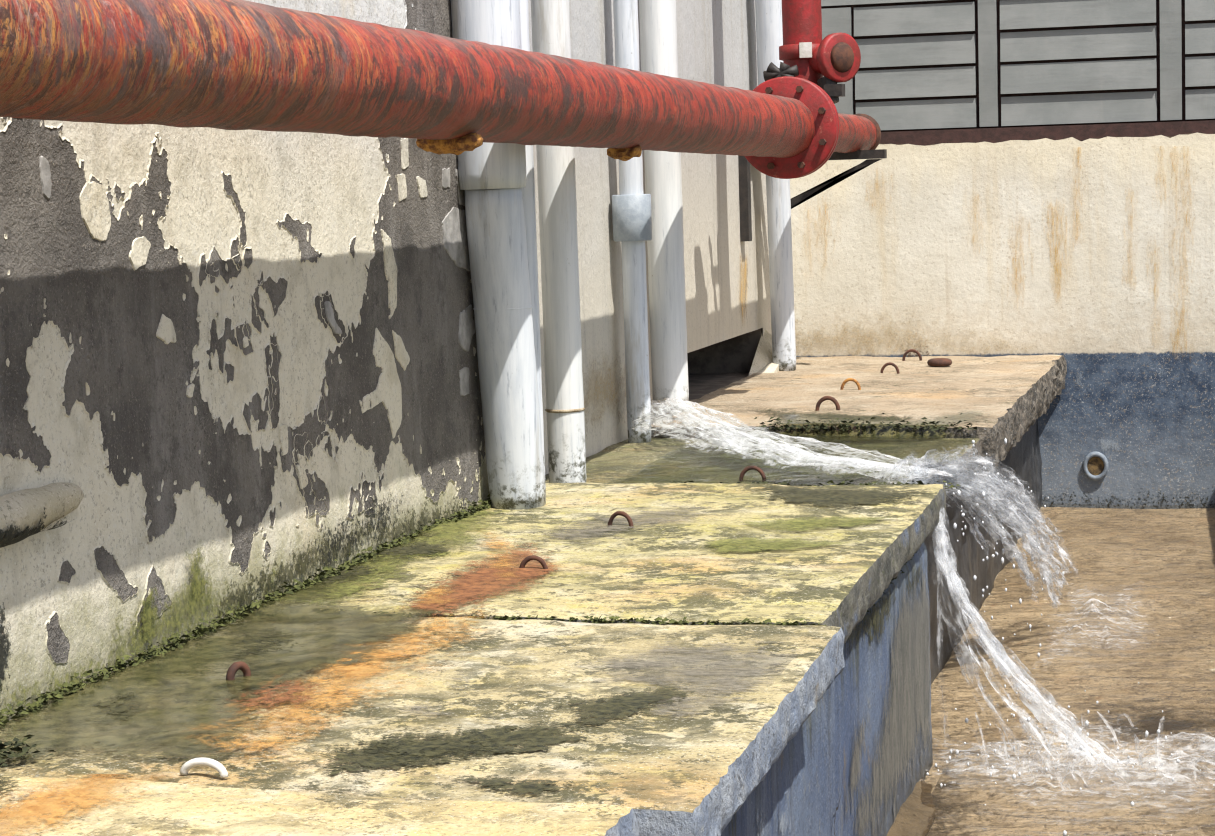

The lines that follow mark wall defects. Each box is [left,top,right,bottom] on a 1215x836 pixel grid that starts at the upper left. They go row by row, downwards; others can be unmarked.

peeling [403,0,452,38]
peeling [0,117,486,576]
peeling [57,559,76,585]
peeling [92,544,172,638]
water stain [0,490,436,772]
corrosion [217,539,557,758]
corrosion [0,774,138,836]